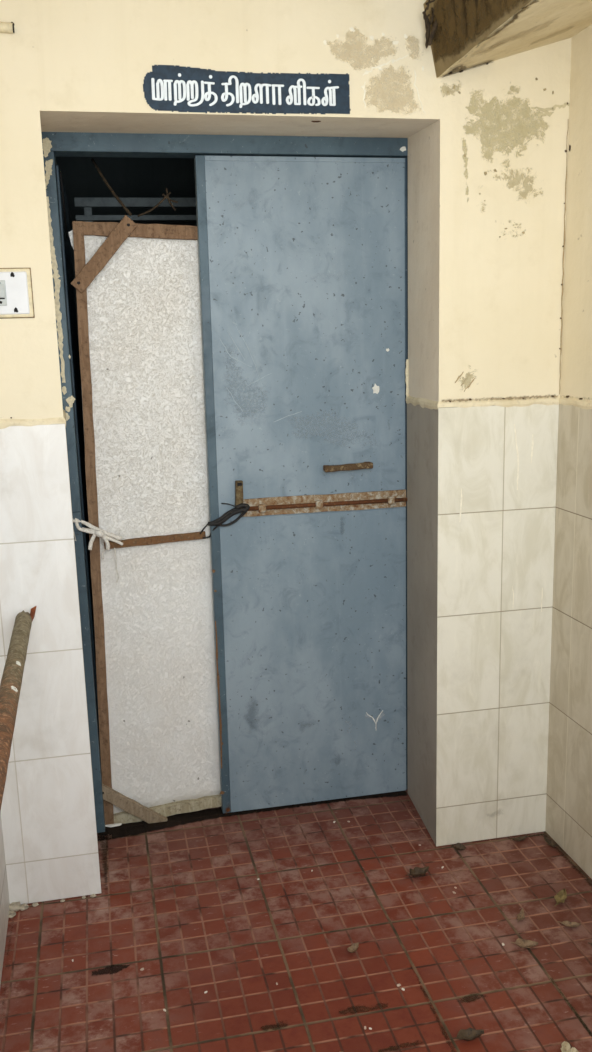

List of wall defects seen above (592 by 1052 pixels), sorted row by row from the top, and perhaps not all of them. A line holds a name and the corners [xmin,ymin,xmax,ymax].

peeling [323,27,426,114]
peeling [441,78,570,212]